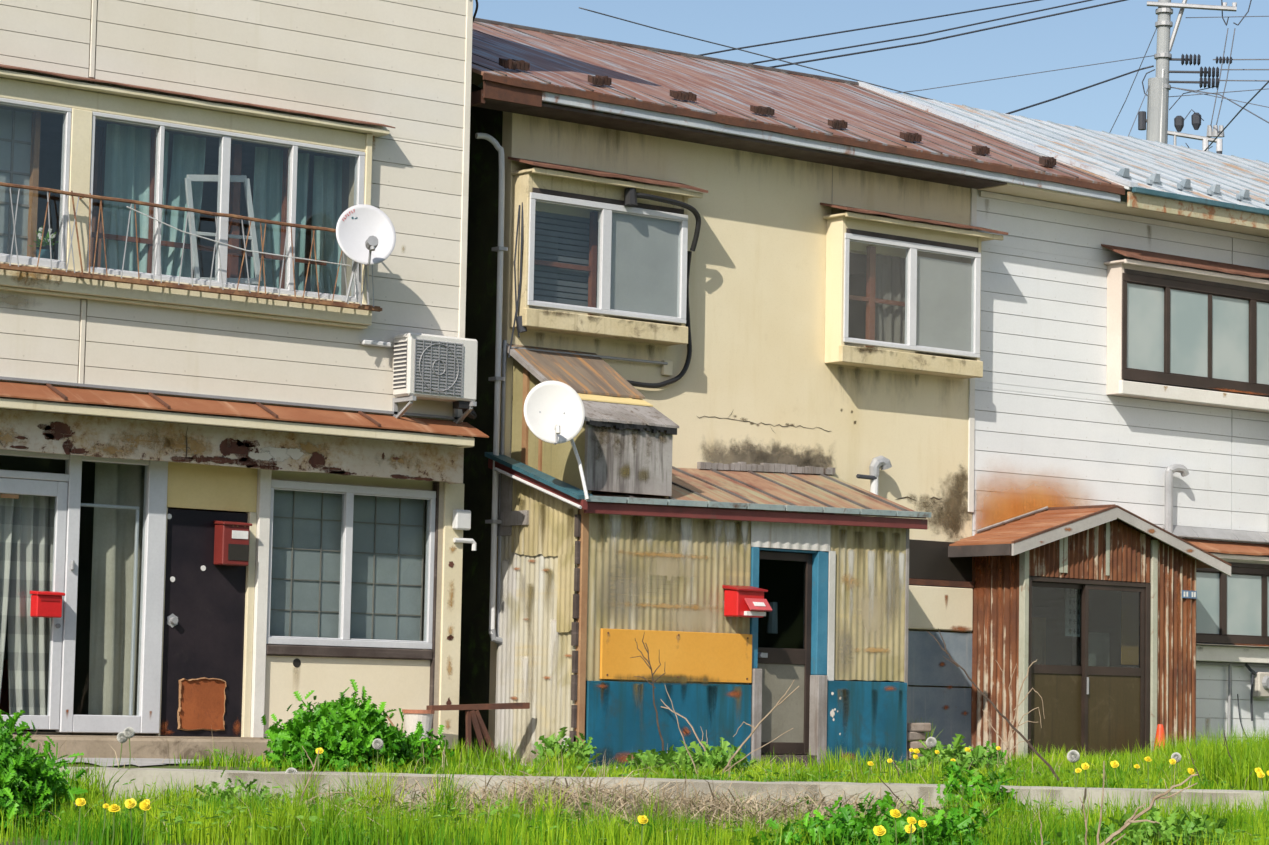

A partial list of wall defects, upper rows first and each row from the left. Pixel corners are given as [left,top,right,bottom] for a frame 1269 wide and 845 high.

peeling [38,421,89,455]
crack [697,409,830,433]
peeling [170,438,357,476]
peeling [382,452,433,481]
damp [621,467,648,479]
damp [705,444,831,474]
damp [910,472,969,538]
corrosion [978,485,1074,533]